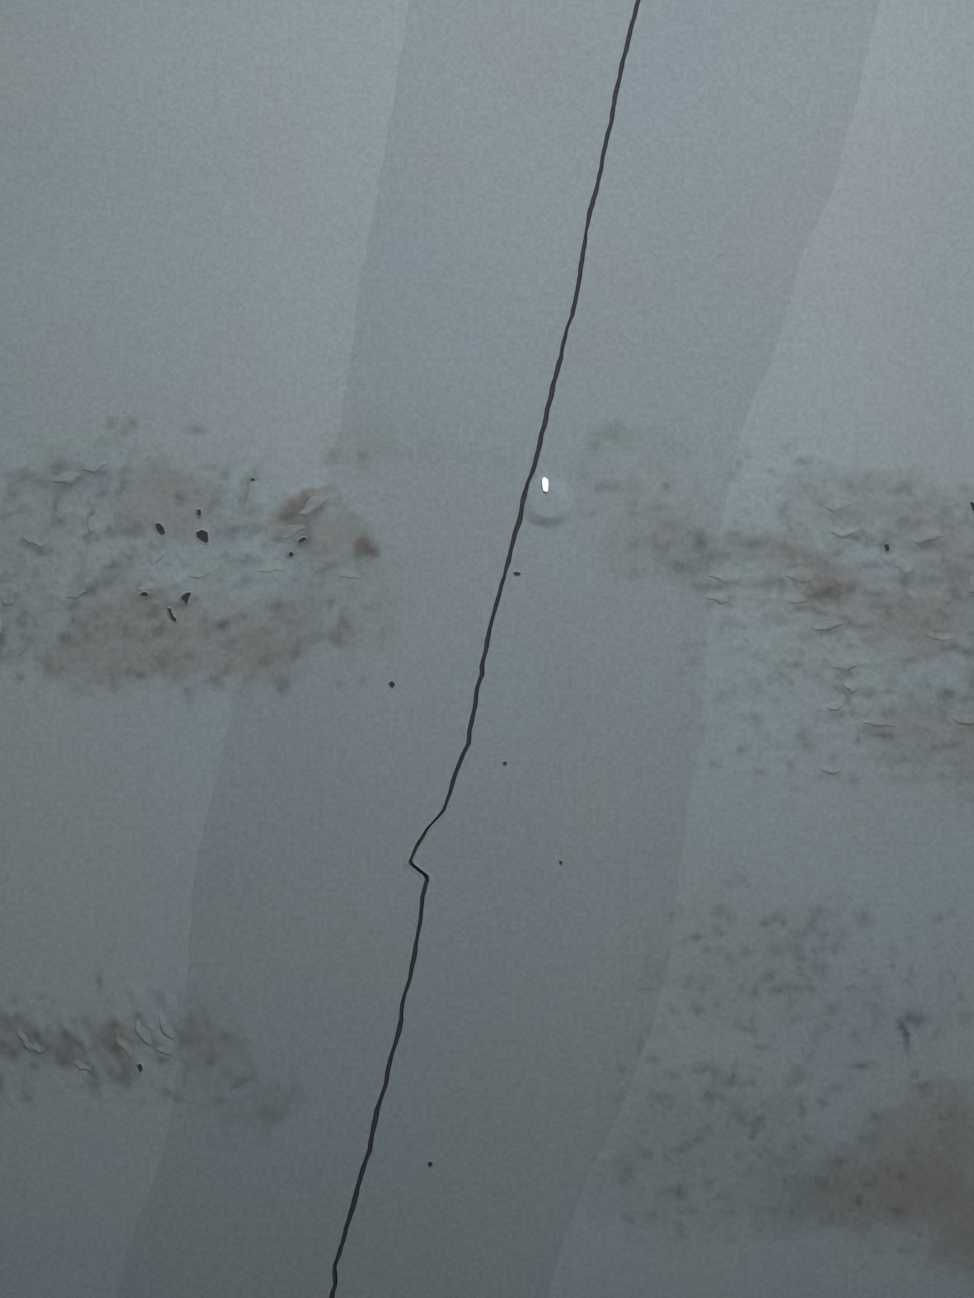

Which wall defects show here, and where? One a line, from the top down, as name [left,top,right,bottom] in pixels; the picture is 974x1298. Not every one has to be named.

crack [325,0,644,1298]